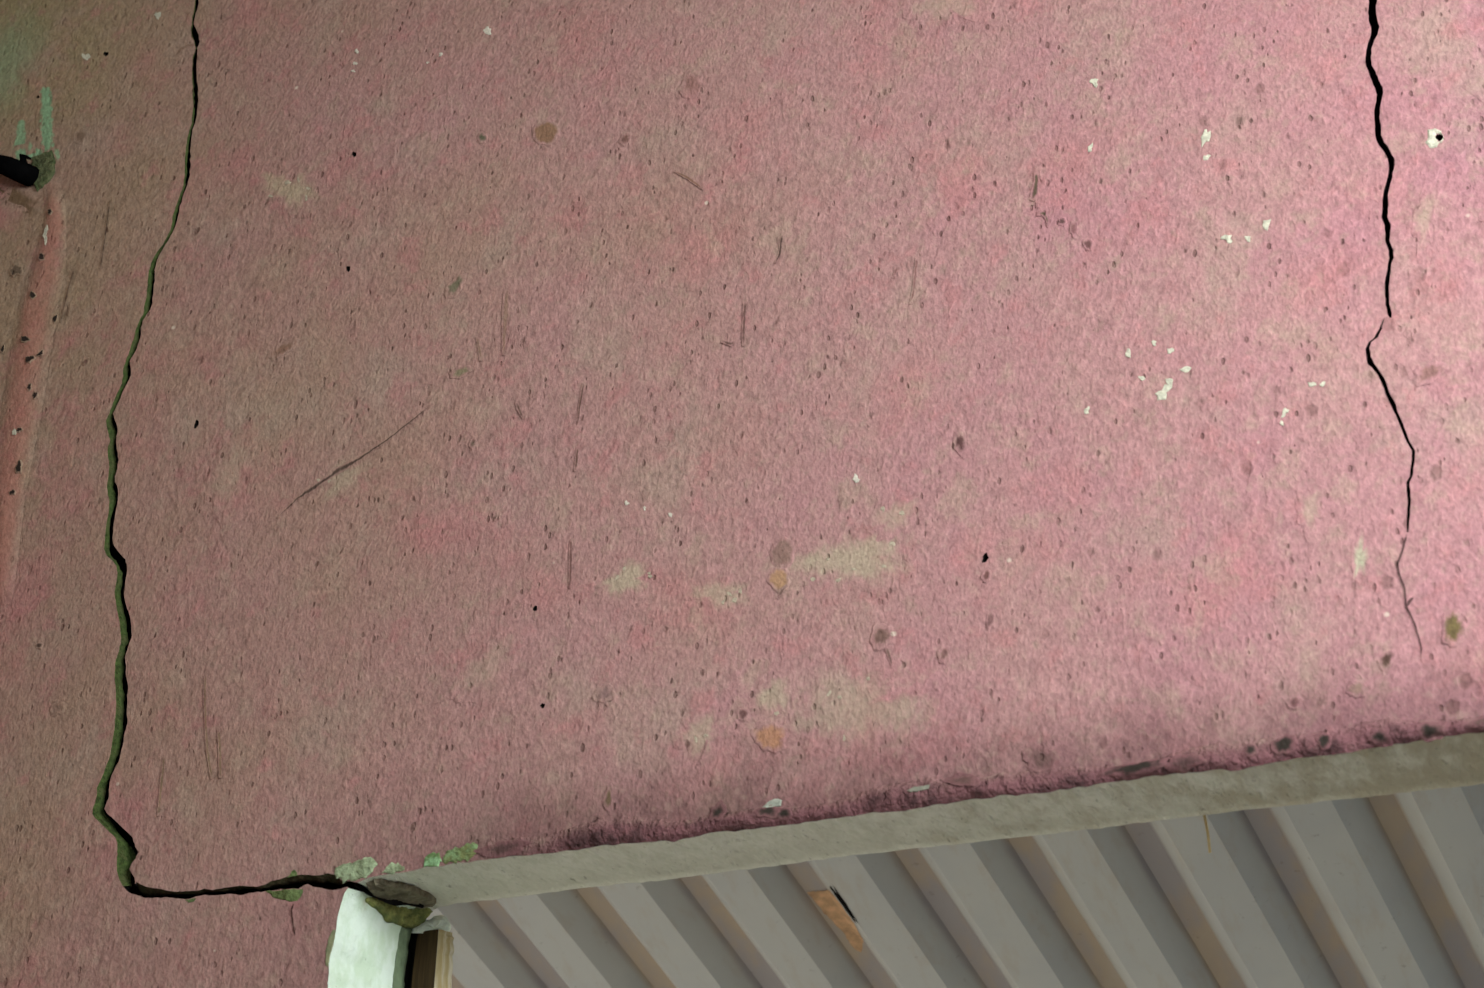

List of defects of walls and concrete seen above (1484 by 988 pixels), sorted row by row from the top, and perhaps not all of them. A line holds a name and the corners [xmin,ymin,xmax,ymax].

crack [92,0,424,935]
crack [1365,0,1423,658]